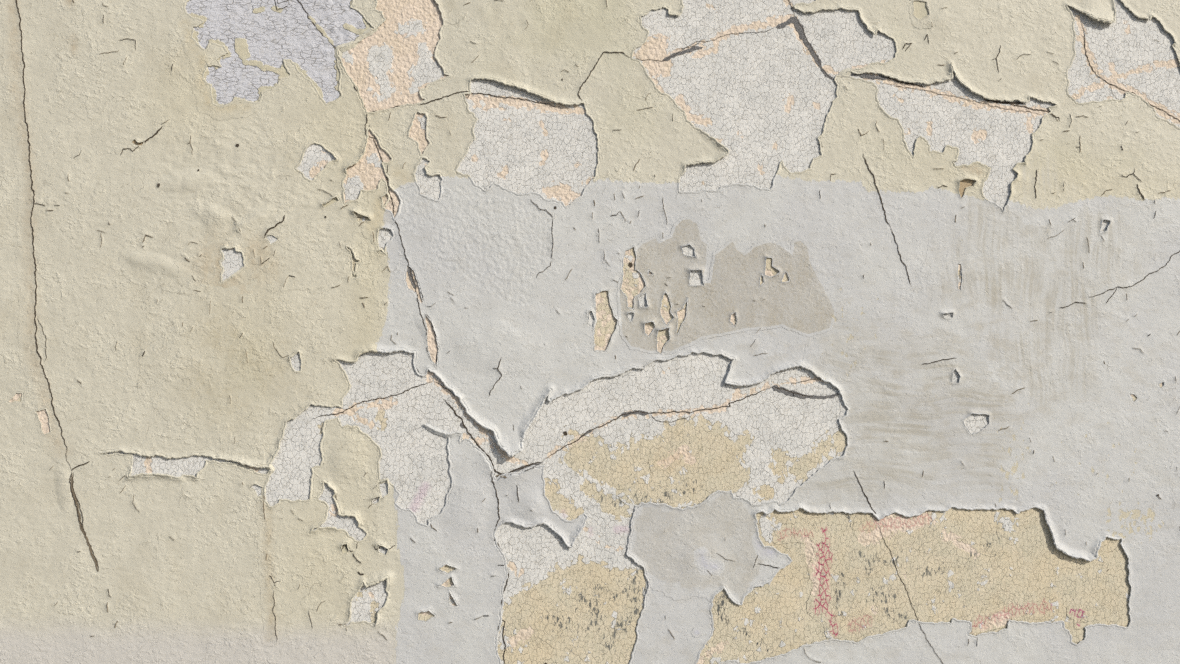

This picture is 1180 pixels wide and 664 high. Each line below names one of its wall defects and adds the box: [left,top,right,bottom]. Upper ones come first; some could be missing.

peeling [294,0,601,257]
peeling [95,244,1133,664]
crack [266,0,1180,664]
peeling [630,0,1180,213]